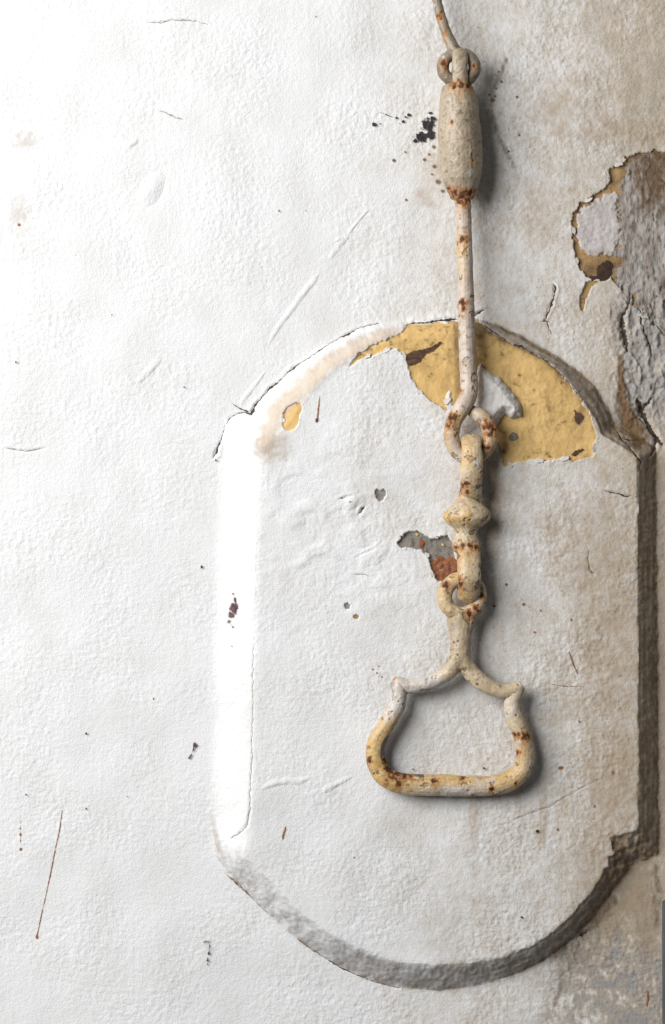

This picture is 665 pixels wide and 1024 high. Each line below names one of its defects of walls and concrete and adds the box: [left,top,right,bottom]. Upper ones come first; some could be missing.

flaking render [570,149,665,336]
peeling [281,402,302,431]
crack [213,323,379,457]
peeling [349,321,460,411]
peeling [473,323,596,468]
flaking render [397,531,457,581]
corrosion [35,810,63,939]